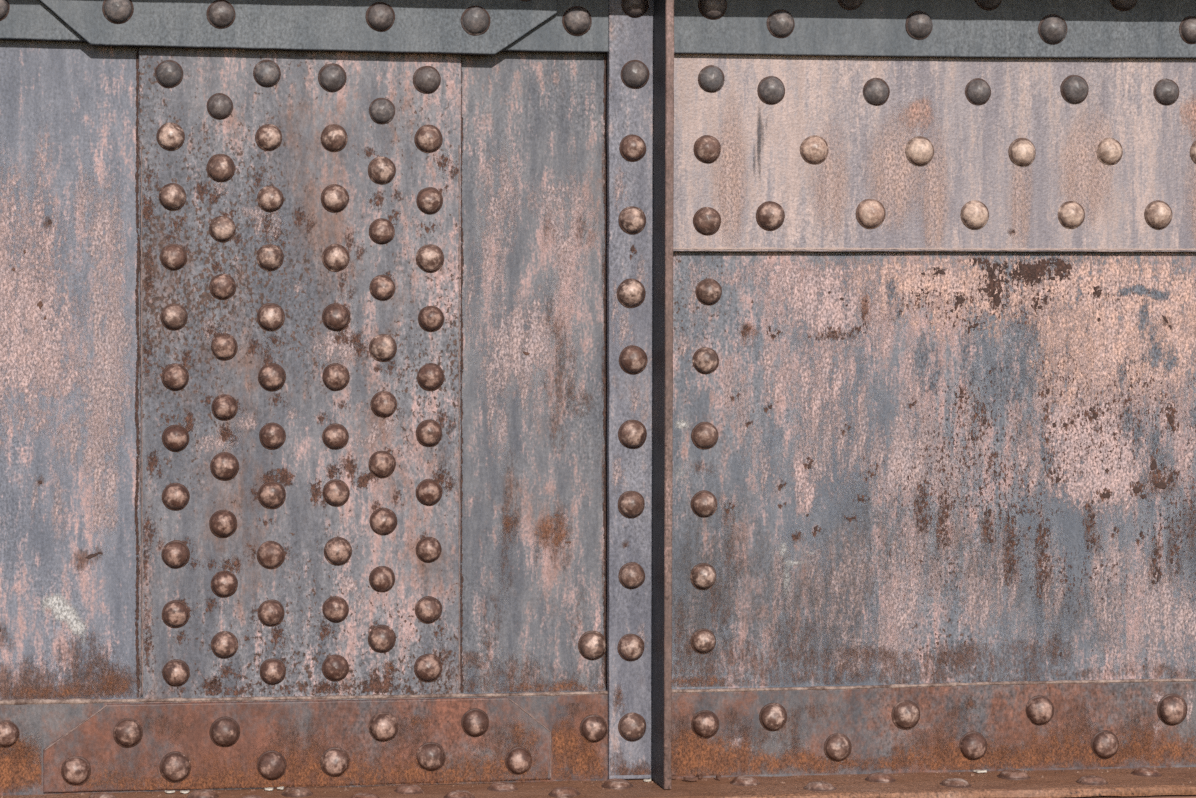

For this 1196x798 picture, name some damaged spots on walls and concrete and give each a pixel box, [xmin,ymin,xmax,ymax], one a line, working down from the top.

rust [335,274,396,374]
rust [954,387,990,471]
rust [1038,380,1102,485]
rust [1160,393,1179,435]
rust [310,456,377,507]
rust [914,479,952,550]
rust [1083,467,1119,549]
rust [1127,448,1180,499]
rust [1136,525,1194,584]
rust [201,626,424,696]
rust [89,703,645,790]
rust [671,715,1196,776]